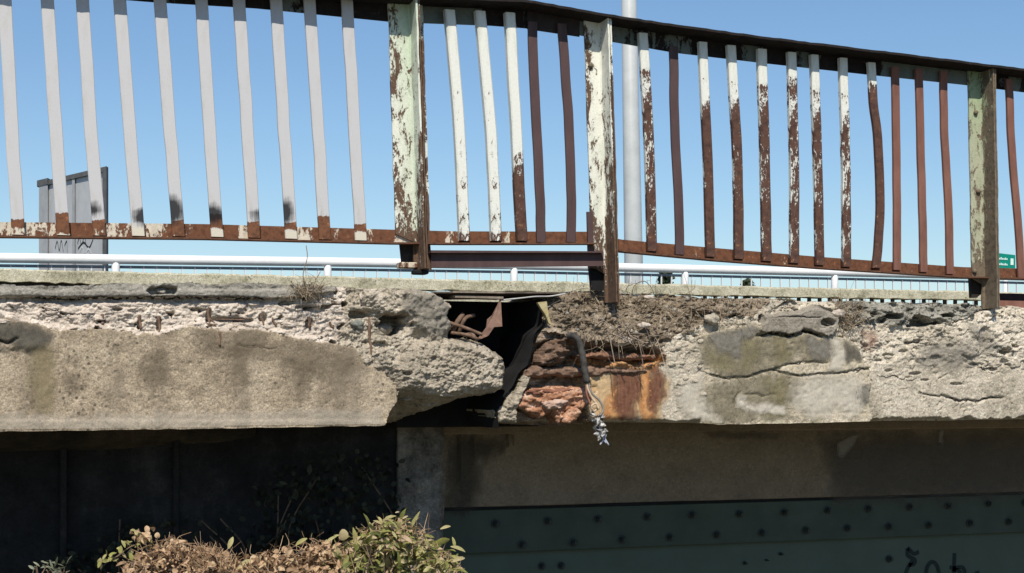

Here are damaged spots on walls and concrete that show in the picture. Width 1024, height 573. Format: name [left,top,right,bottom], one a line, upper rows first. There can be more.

damp [0,316,52,354]
spalling [0,286,1024,426]
rust [516,335,669,424]
crack [700,358,1002,406]